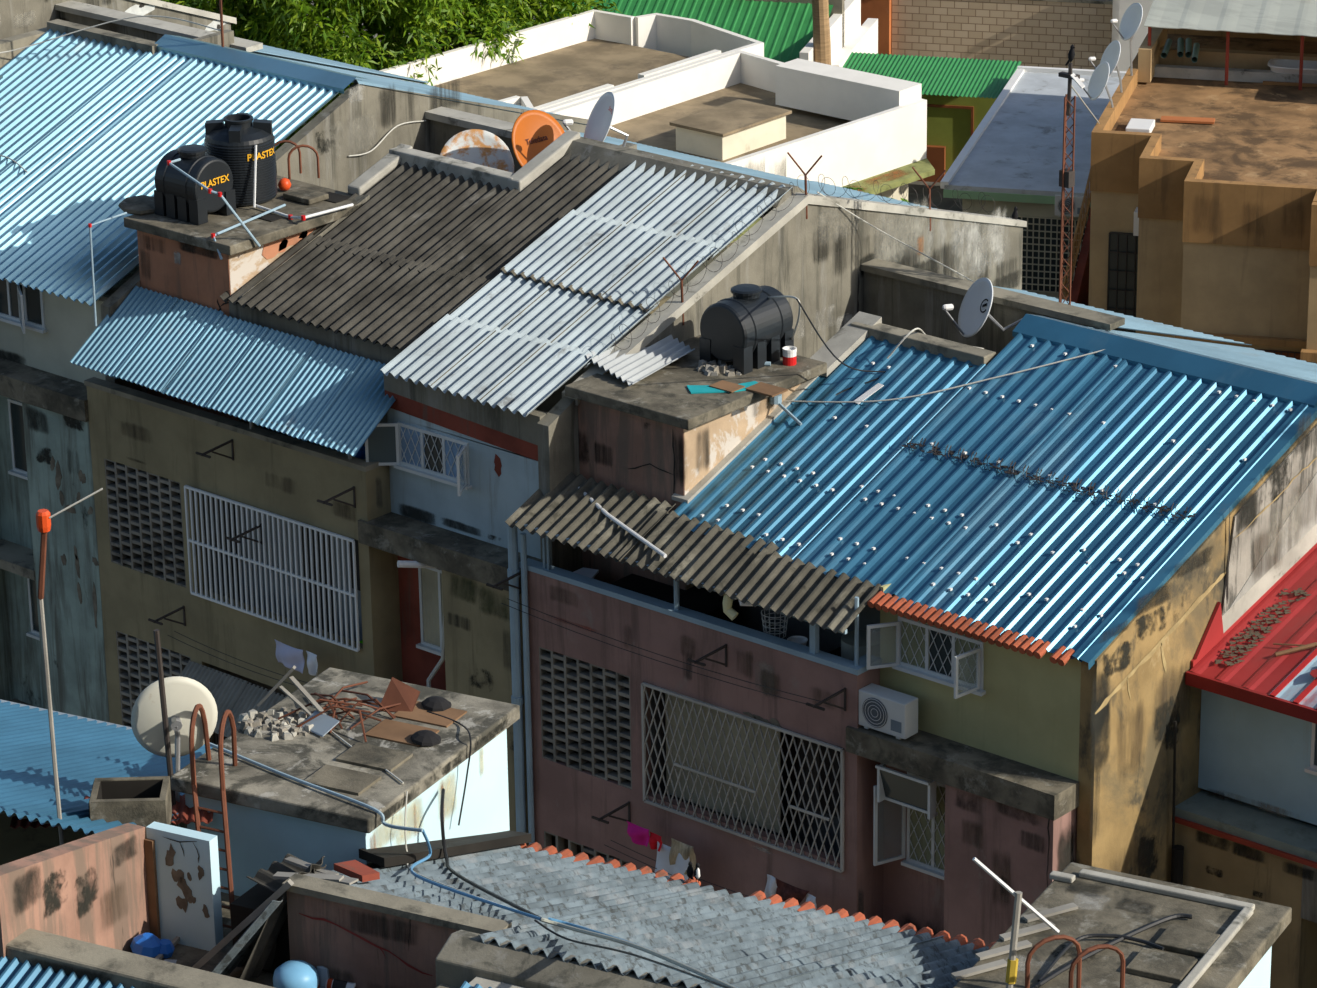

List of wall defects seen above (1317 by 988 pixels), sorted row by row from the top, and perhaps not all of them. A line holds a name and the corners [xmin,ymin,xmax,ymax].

leakage [0,350,22,364]
leakage [27,408,46,432]
leakage [63,415,83,431]
leakage [36,448,51,464]
leakage [1239,417,1310,528]
leakage [1091,585,1187,768]
leakage [1135,836,1158,877]
leakage [1197,832,1262,861]
leakage [1286,863,1314,880]